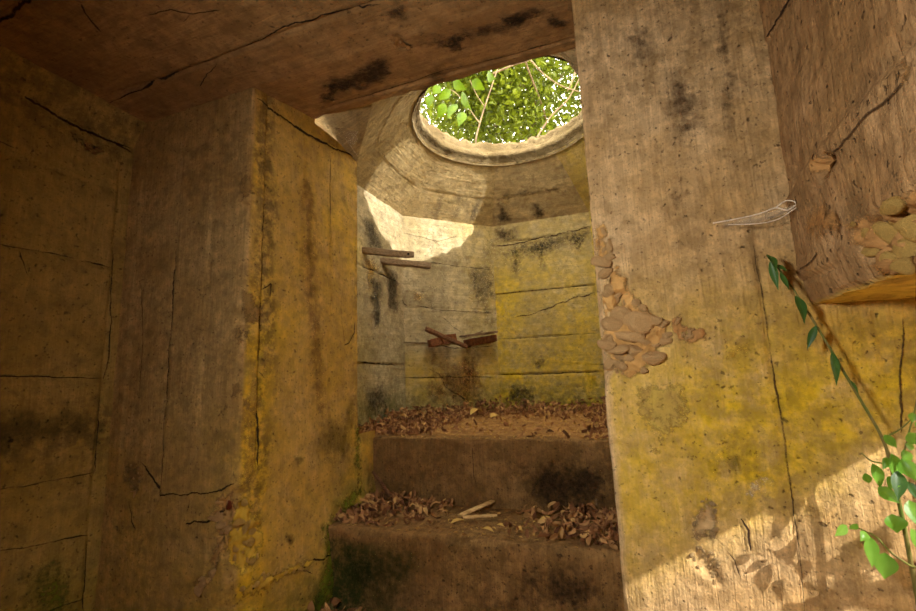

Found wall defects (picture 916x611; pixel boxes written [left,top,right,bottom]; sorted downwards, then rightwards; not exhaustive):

crack [110,0,379,103]
spalling [315,103,373,162]
damp [322,61,391,101]
damp [447,9,541,51]
crack [830,73,908,155]
damp [366,221,381,248]
spalling [844,191,916,275]
damp [371,274,398,324]
crack [402,285,595,349]
spalling [357,184,706,442]
crack [753,245,805,611]
spalling [689,498,721,585]